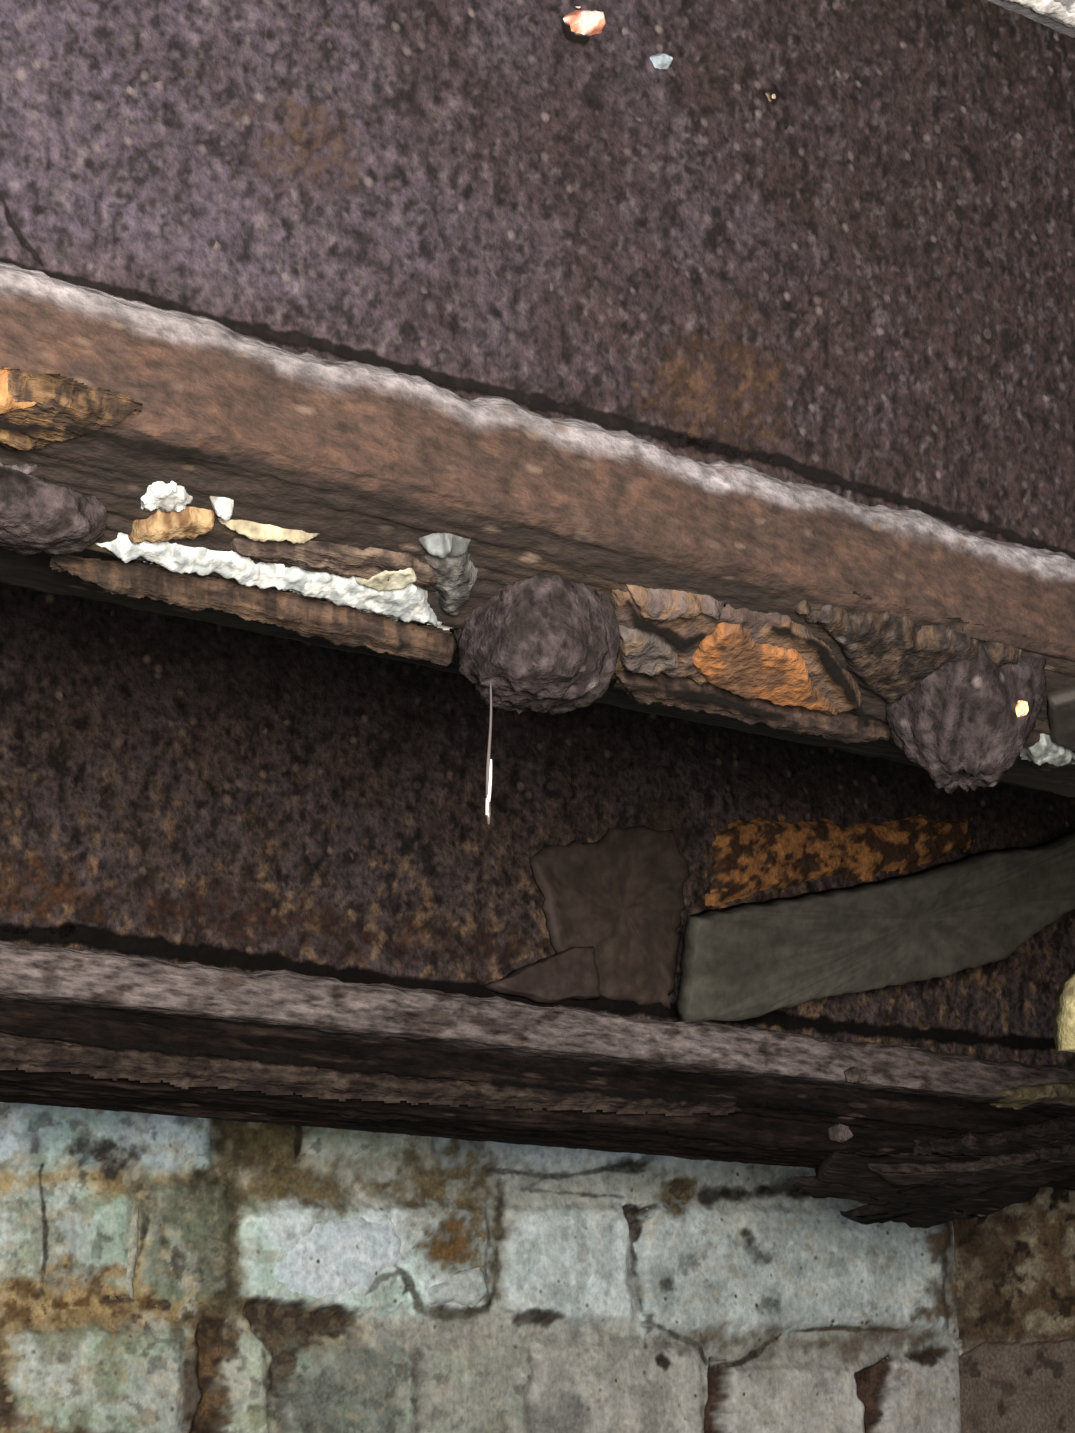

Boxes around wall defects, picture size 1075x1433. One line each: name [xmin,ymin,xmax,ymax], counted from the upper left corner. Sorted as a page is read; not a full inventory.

water stain [69,1139,138,1176]
water stain [125,1119,240,1299]
peeling [793,1116,1075,1229]
crack [367,1268,423,1313]
water stain [292,1352,394,1433]
water stain [411,1350,424,1433]